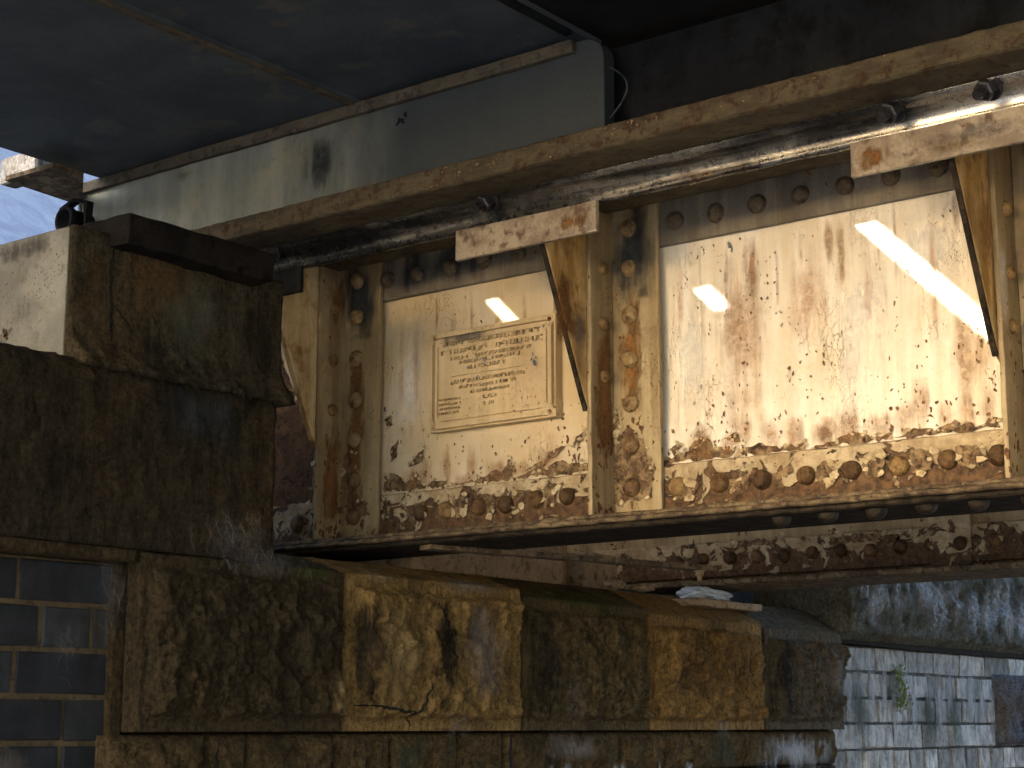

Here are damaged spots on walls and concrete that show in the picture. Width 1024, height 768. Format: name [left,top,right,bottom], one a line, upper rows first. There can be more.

water stain [312,145,330,183]
rust [980,193,994,256]
rust [596,303,641,461]
rust [323,363,364,519]
peeling [382,407,588,522]
peeling [612,366,1002,507]
peeling [729,531,788,555]
peeling [821,529,900,547]
crack [353,666,454,725]